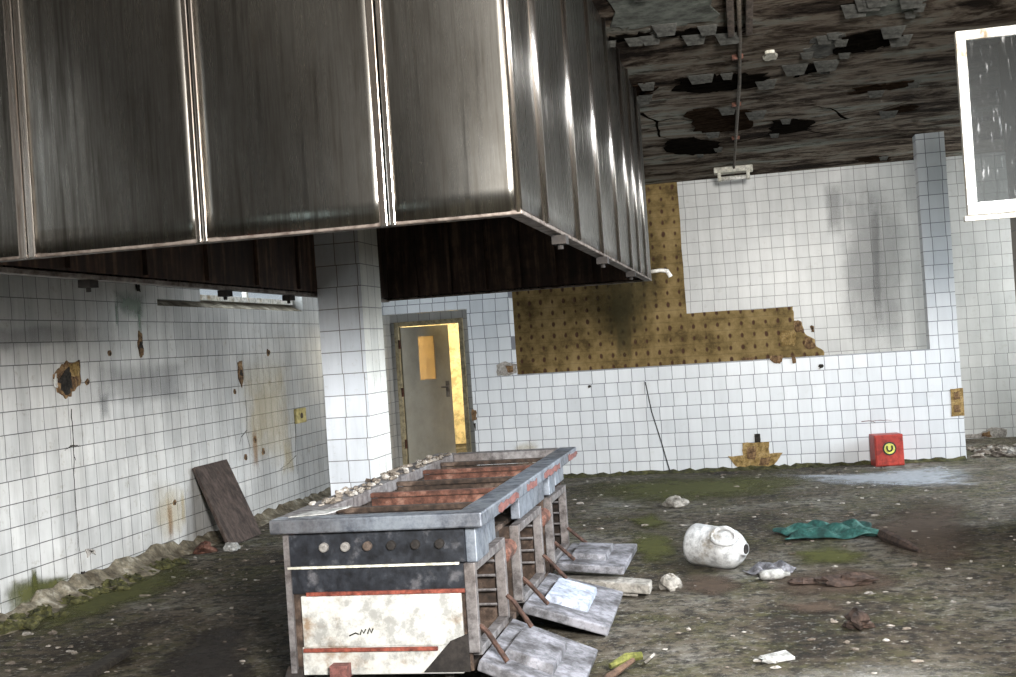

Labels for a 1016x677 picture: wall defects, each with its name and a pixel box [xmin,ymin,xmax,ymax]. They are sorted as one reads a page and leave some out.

spalling [671,0,927,93]
spalling [632,82,659,105]
spalling [847,80,920,98]
spalling [879,105,920,119]
spalling [663,107,816,158]
peeling [496,182,824,376]
spalling [53,360,89,399]